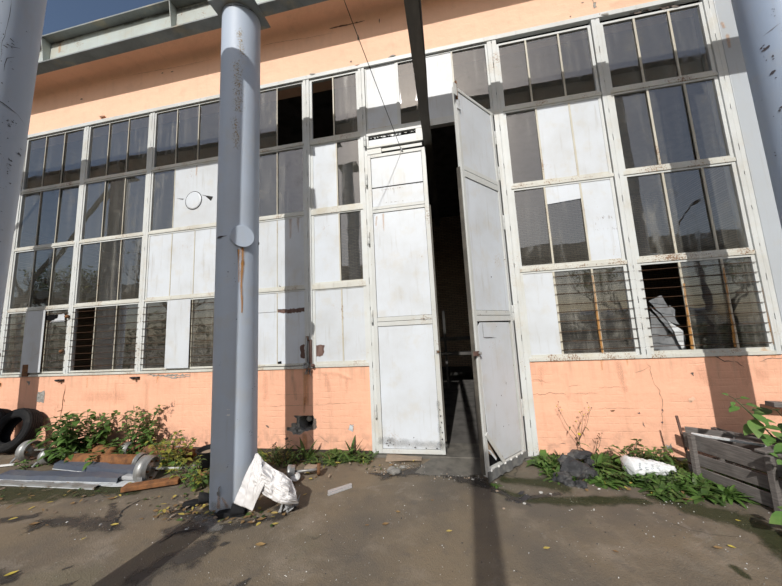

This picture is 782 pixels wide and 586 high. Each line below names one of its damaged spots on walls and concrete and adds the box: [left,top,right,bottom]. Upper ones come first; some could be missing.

crack [600,358,663,427]
spalling [284,412,321,443]